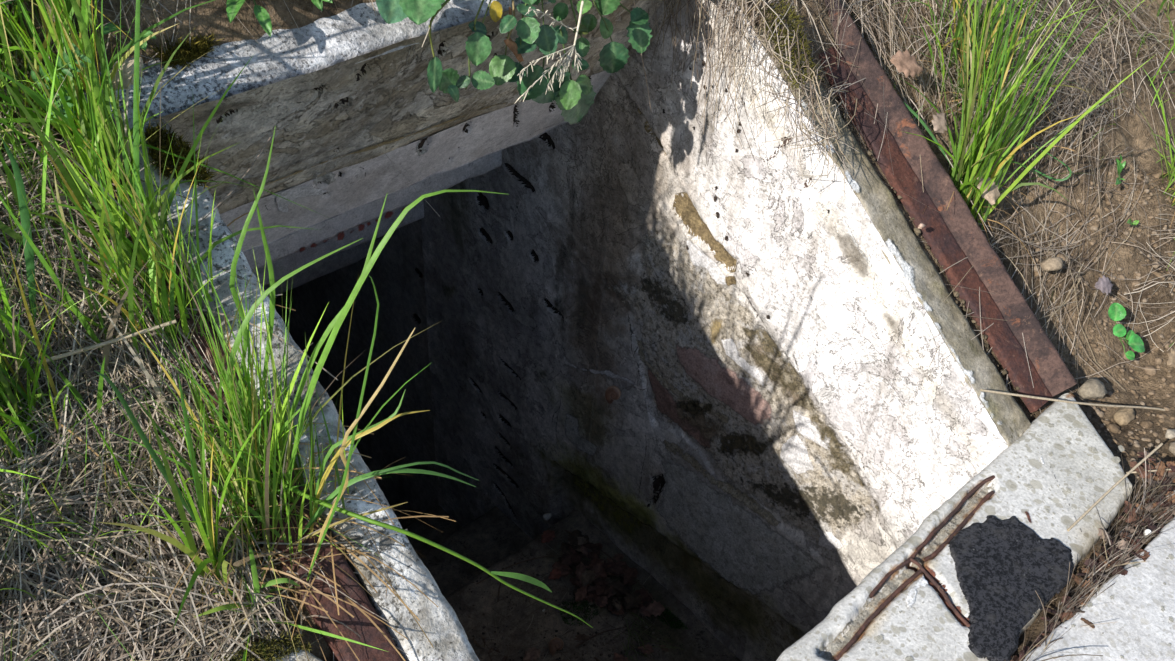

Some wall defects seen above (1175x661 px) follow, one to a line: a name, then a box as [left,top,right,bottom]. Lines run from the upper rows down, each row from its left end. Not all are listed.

peeling [845,170,860,192]
peeling [608,227,873,595]
peeling [886,239,1002,425]
spalling [818,475,995,661]